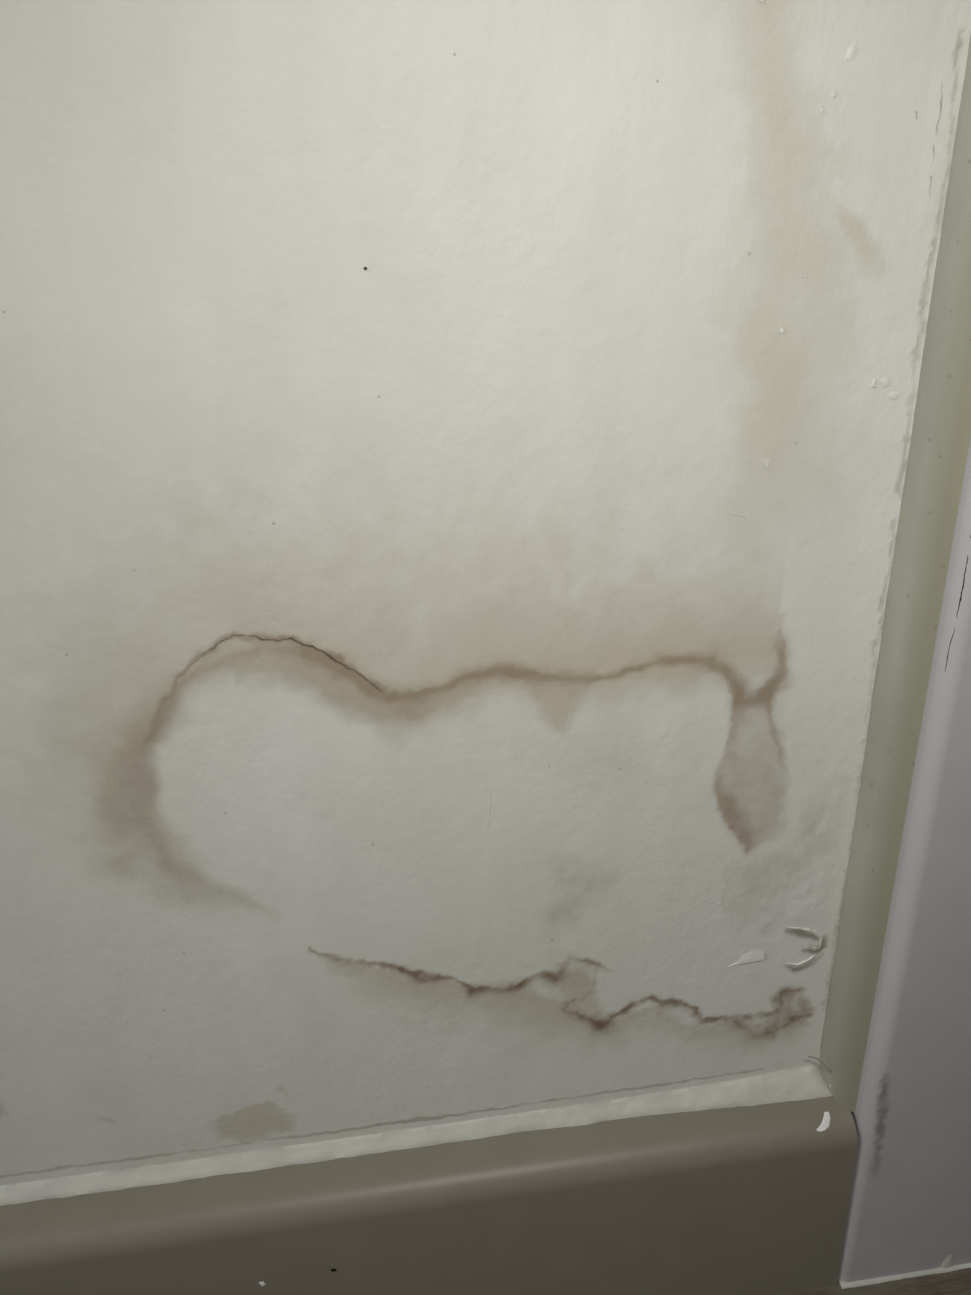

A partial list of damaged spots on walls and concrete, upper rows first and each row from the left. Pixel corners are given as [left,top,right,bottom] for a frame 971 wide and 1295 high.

damp [177,622,784,727]
peeling [787,927,825,971]
damp [372,963,811,1035]